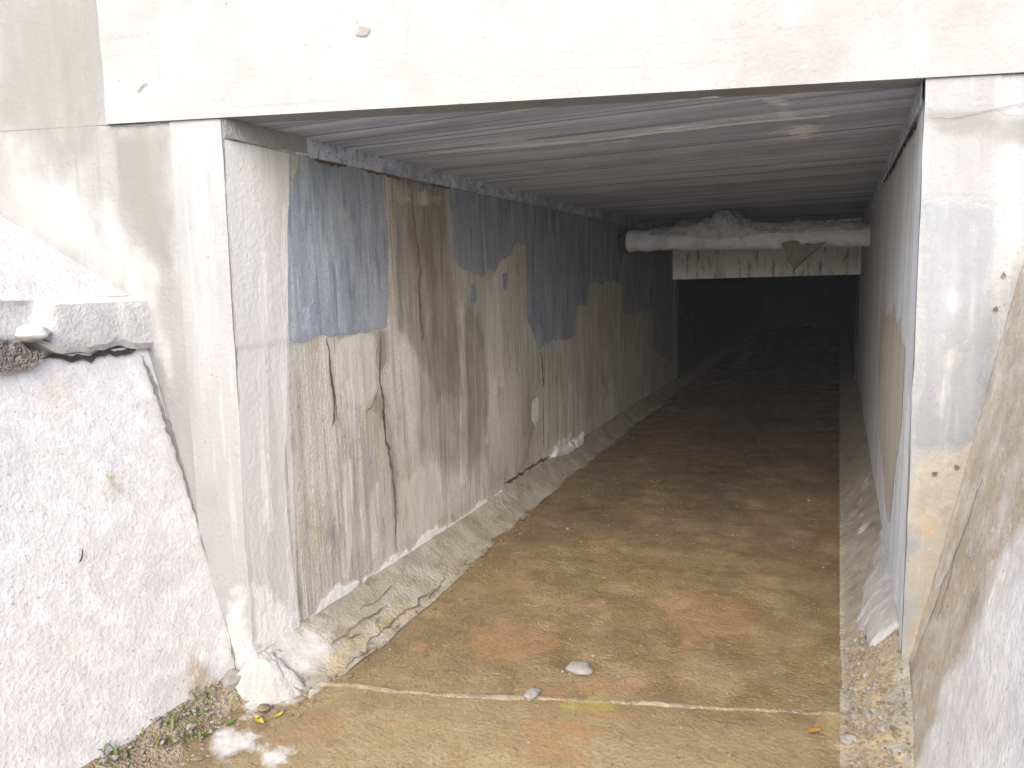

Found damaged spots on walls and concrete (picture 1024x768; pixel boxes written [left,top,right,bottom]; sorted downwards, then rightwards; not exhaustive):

peeling [287,155,388,343]
peeling [449,187,673,362]
crack [326,338,339,427]
crack [368,332,397,545]
crack [504,355,548,484]
peeling [879,303,905,520]
crack [329,572,445,670]
damp [316,489,502,614]